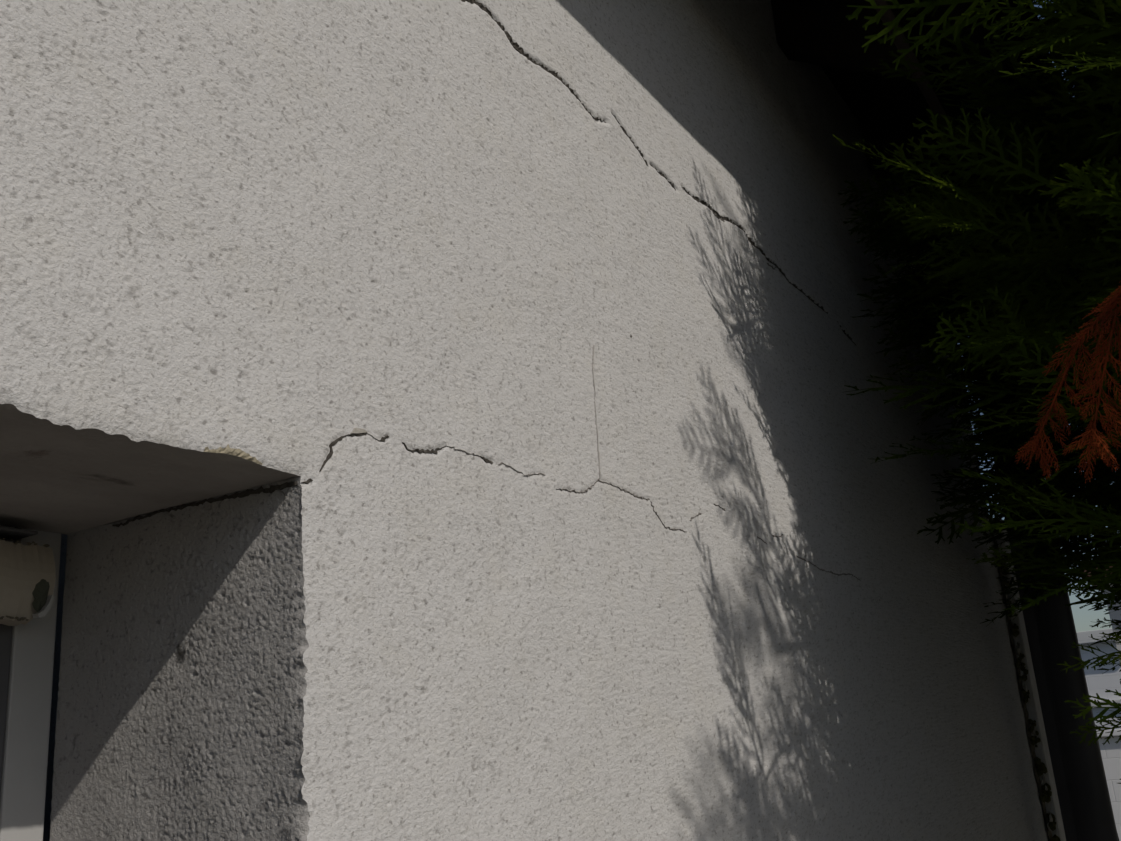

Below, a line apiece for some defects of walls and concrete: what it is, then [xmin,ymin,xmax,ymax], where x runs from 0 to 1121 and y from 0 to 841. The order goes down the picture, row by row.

crack [461,0,856,345]
crack [112,345,726,532]
crack [759,534,861,581]